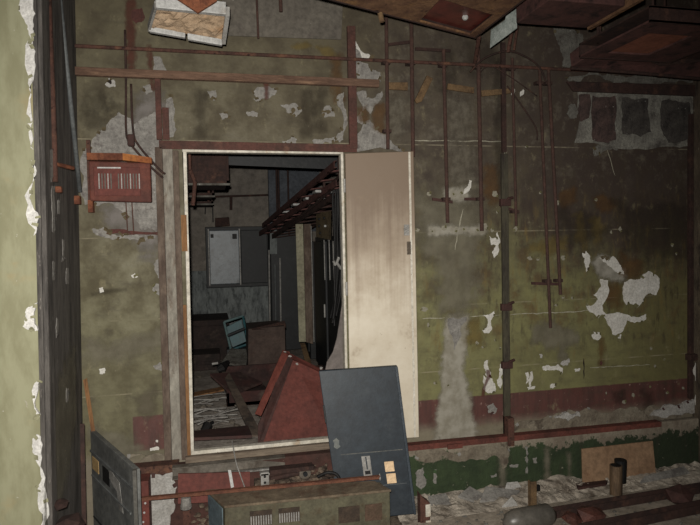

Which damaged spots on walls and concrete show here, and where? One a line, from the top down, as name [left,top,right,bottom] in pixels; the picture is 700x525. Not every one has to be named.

flaking render [18,0,36,150]
flaking render [356,43,382,82]
flaking render [357,91,405,152]
flaking render [25,160,41,235]
flaking render [80,94,176,245]
flaking render [22,302,39,332]
leakage [414,96,487,440]
peeling [582,250,660,342]
peeling [483,360,503,394]
flaking render [514,393,696,432]
flaking render [32,434,50,525]
flaking render [151,472,178,525]